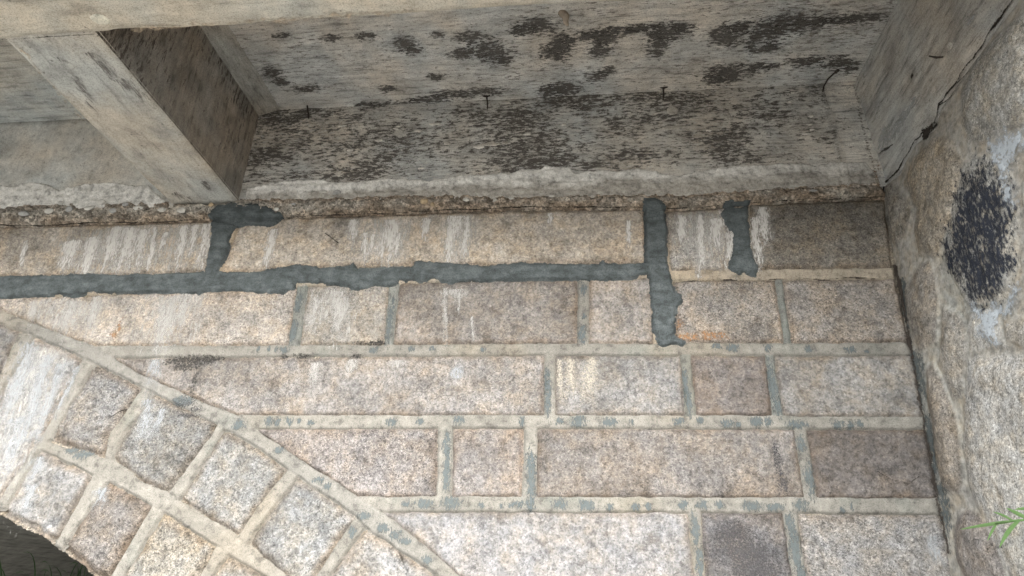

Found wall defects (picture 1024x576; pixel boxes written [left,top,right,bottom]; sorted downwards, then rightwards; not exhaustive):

damp [318,32,377,42]
damp [392,4,889,98]
damp [260,63,325,94]
damp [345,72,513,107]
crack [754,0,1012,203]
damp [986,126,1024,205]
damp [50,223,212,275]
damp [262,228,279,270]
damp [342,215,476,268]
damp [672,212,737,286]
damp [969,281,1021,349]